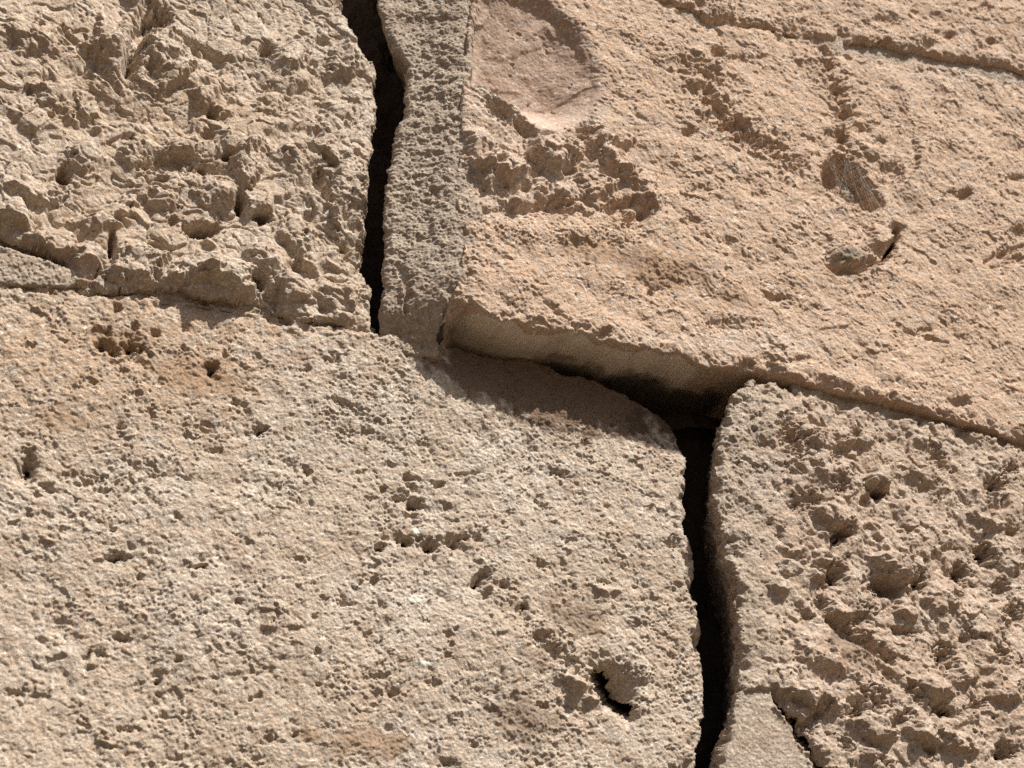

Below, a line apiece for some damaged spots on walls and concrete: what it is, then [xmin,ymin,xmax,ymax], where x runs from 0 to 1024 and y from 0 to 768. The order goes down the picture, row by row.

crack [678,43,802,173]
crack [816,43,855,158]
crack [341,0,406,335]
crack [848,221,907,277]
crack [437,323,445,344]
crack [659,414,726,768]
crack [766,681,827,768]